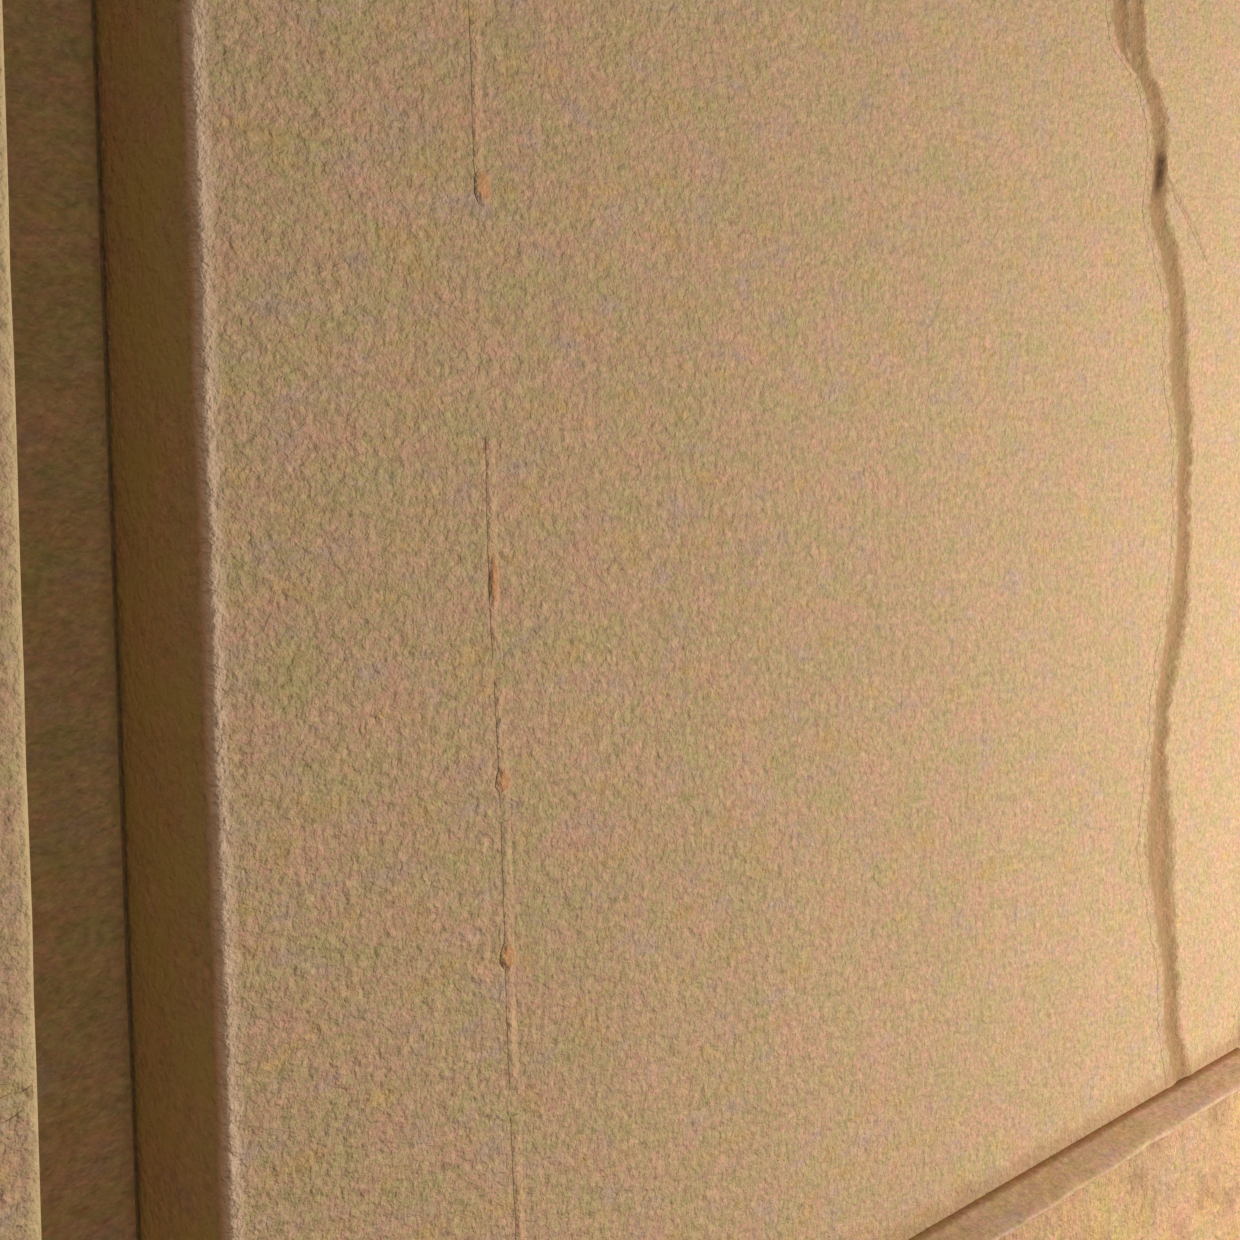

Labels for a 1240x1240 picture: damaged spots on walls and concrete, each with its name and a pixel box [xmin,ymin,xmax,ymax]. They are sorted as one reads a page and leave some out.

crack [1106,0,1213,1089]